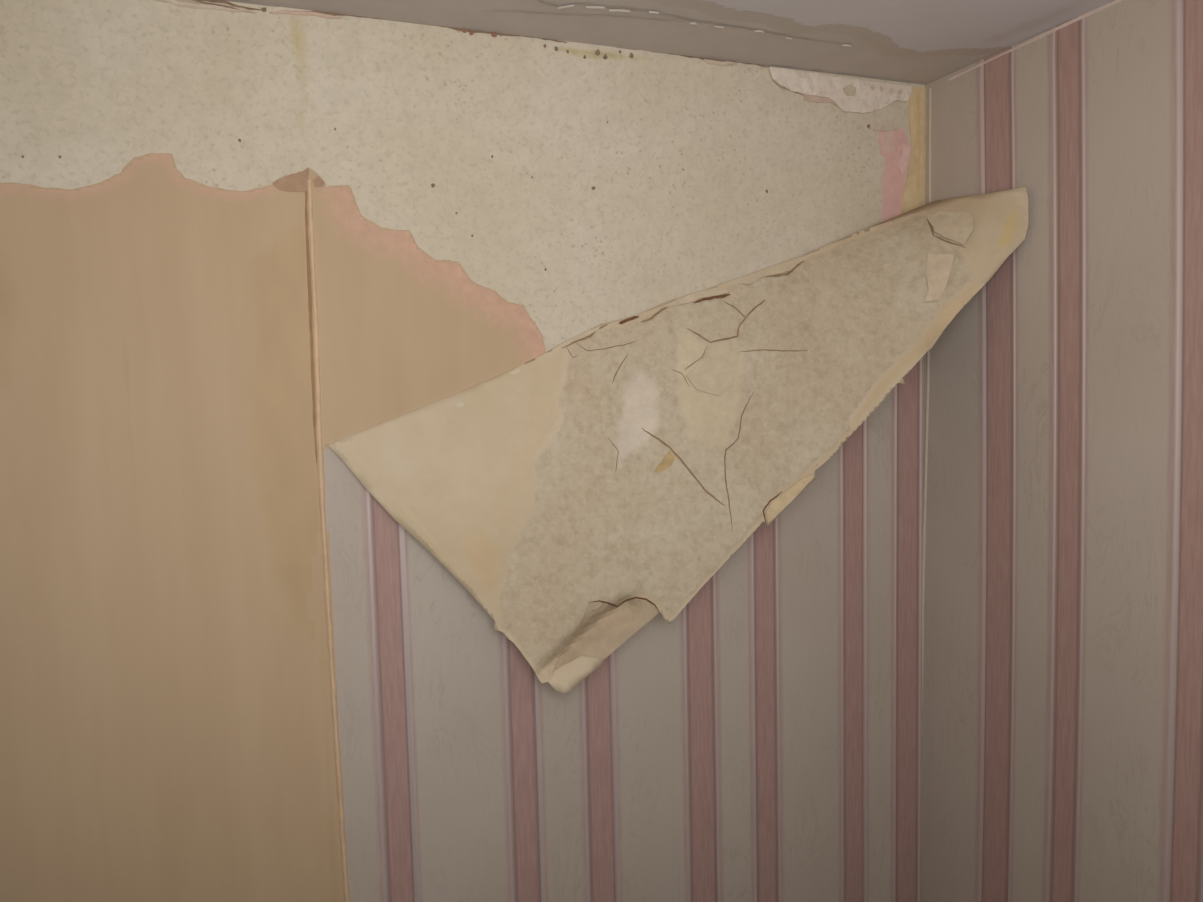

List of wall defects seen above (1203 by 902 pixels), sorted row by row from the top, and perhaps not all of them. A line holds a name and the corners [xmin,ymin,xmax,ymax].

peeling [0,0,1029,694]